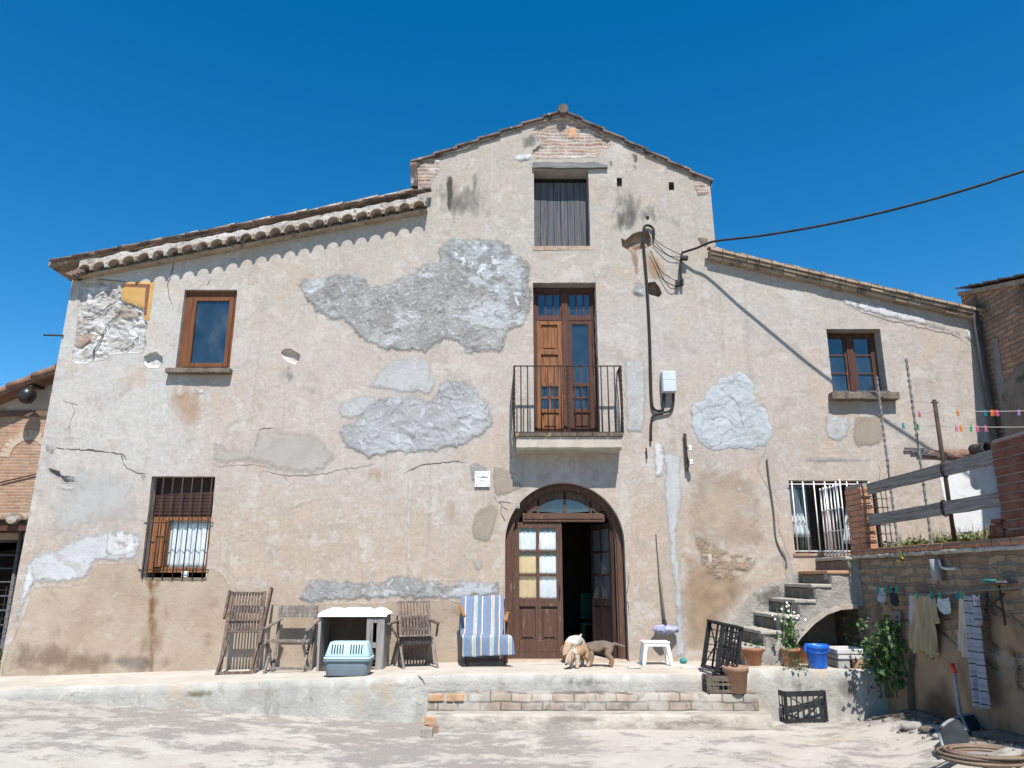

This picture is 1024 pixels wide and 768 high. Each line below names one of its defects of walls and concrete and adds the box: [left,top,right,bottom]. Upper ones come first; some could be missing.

flaking render [515,117,611,161]
spalling [72,279,163,368]
crack [59,401,144,479]
crack [217,427,368,480]
damp [654,442,739,656]
spalling [697,538,755,581]
peeling [2,531,502,677]